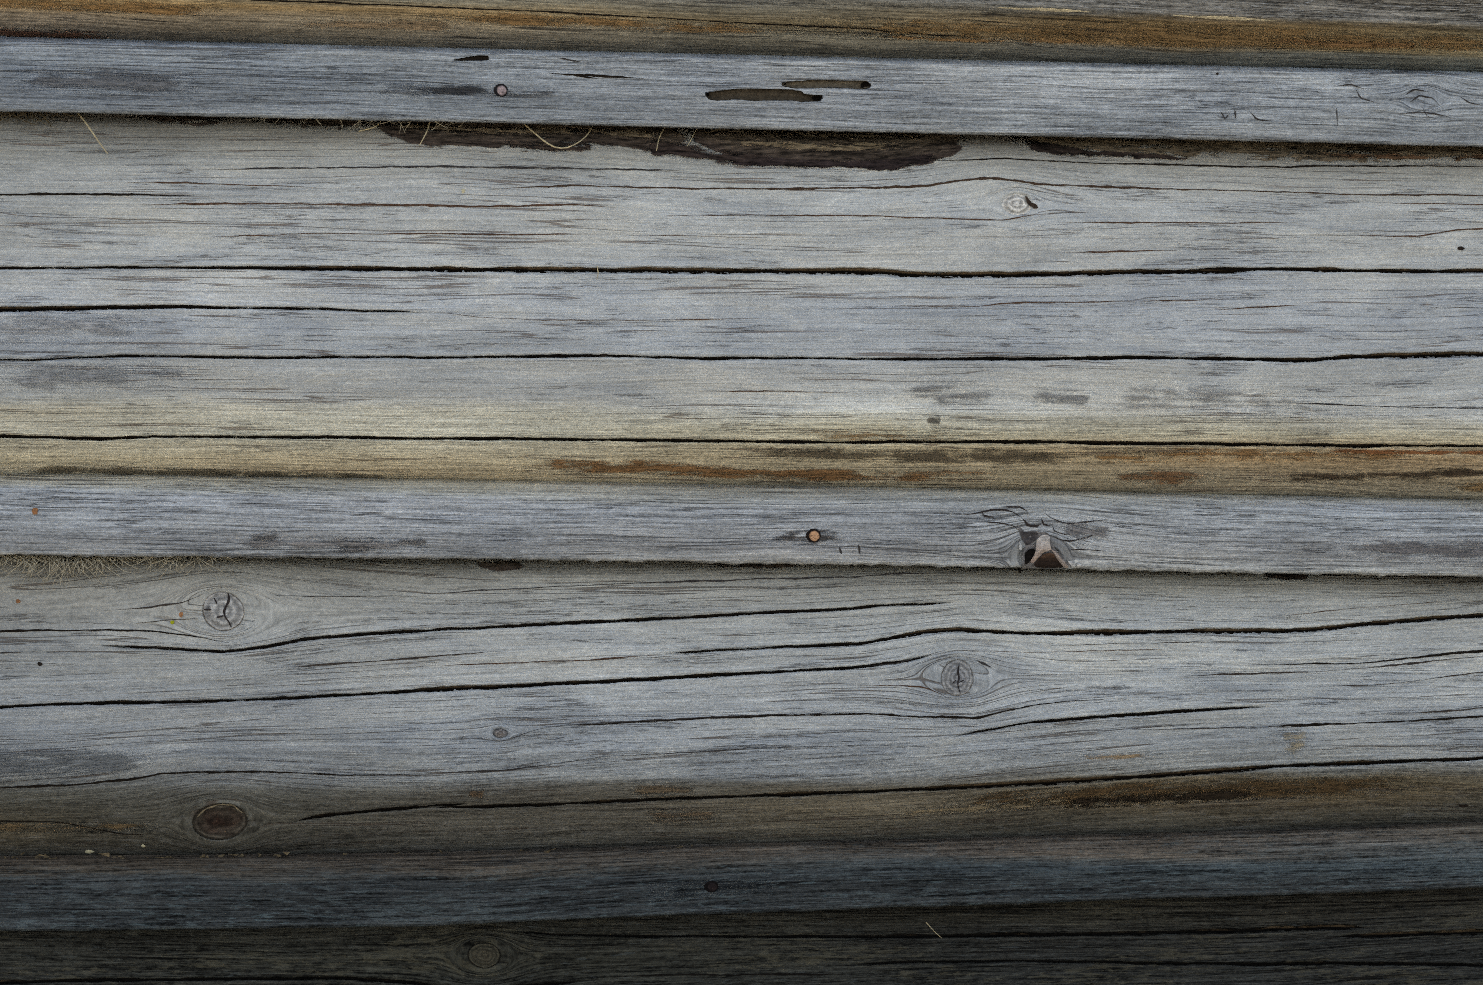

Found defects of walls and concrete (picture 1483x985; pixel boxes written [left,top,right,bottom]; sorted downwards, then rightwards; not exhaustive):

crack [0,157,1483,310]
crack [0,305,1483,393]
crack [1267,401,1483,409]
corrosion [777,530,836,543]
crack [0,545,1483,835]